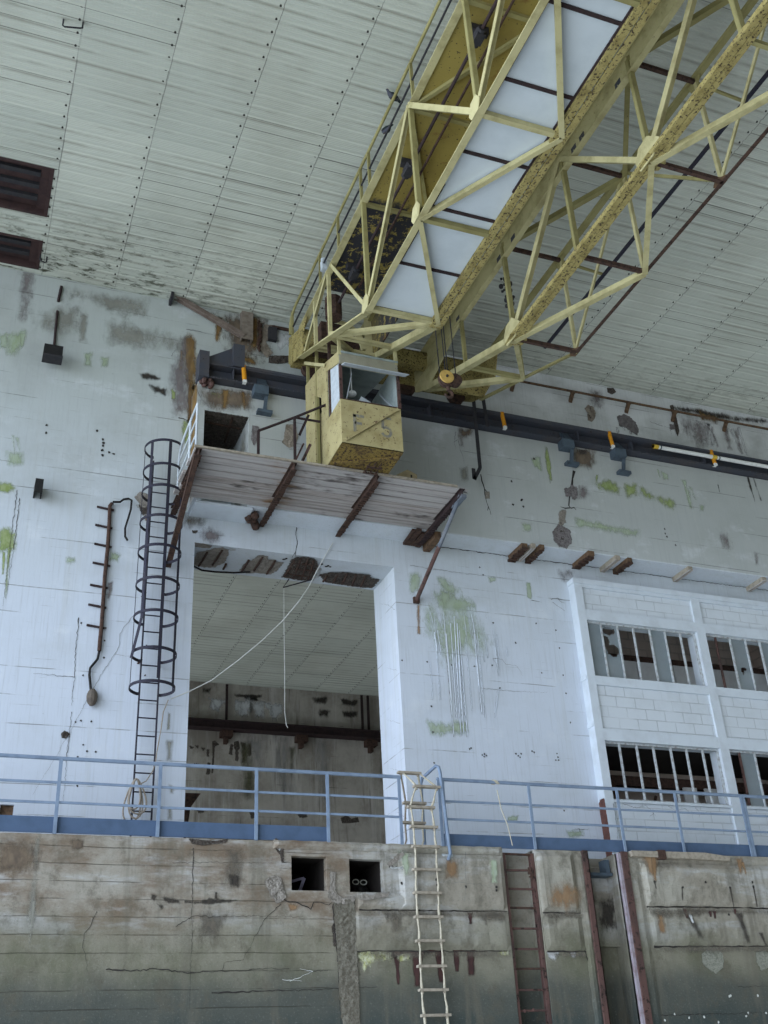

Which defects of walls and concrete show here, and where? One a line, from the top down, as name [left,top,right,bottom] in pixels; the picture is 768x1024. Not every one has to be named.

water stain [96,298,142,312]
water stain [112,327,179,345]
spalling [616,414,639,435]
spalling [192,530,236,570]
spalling [552,524,572,549]
spalling [239,555,379,589]
crack [82,848,507,1012]
rust [393,950,475,986]